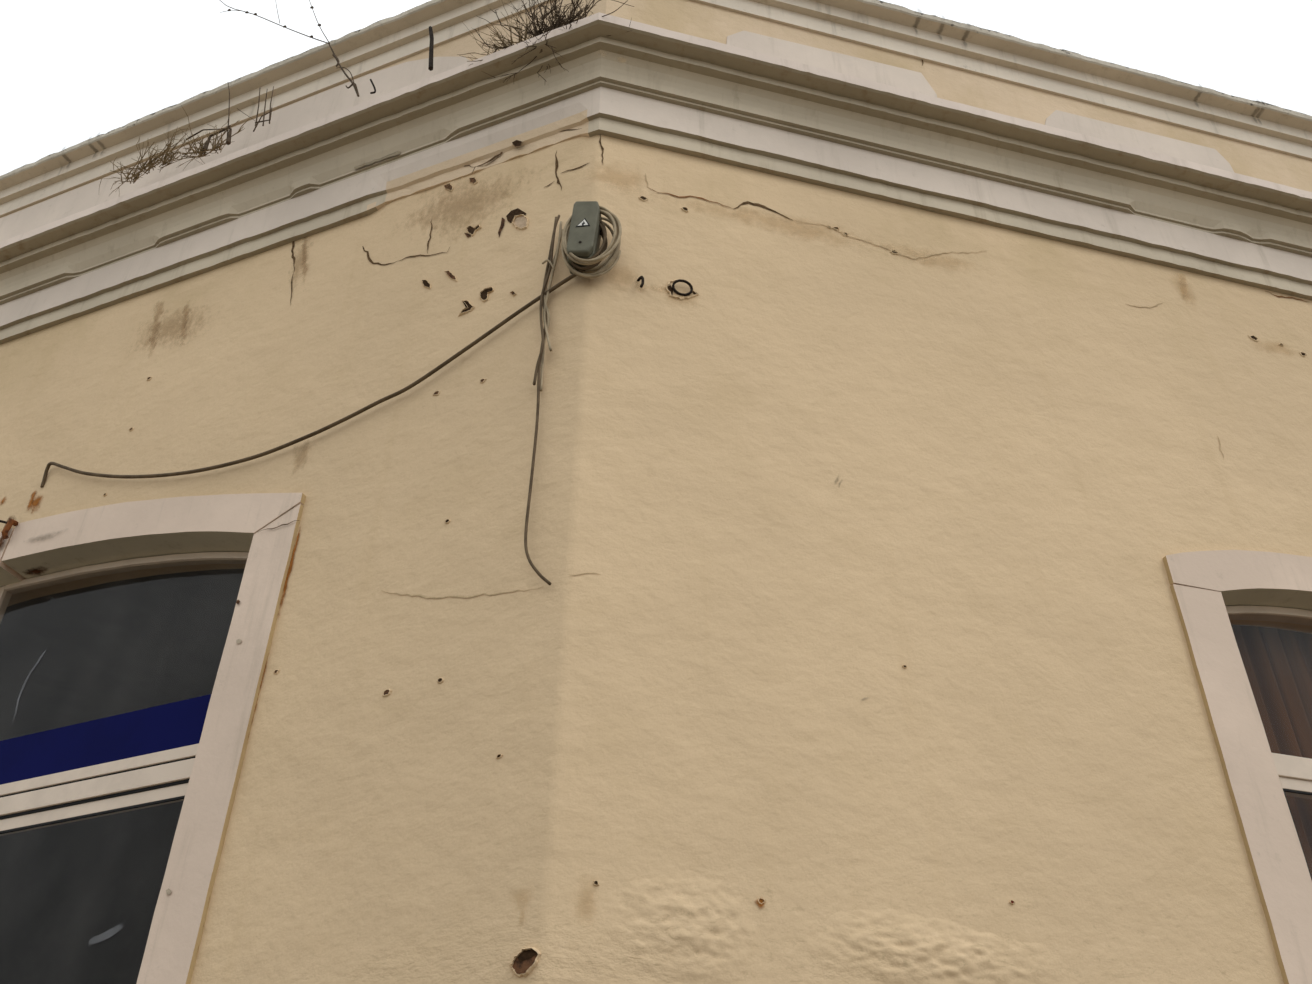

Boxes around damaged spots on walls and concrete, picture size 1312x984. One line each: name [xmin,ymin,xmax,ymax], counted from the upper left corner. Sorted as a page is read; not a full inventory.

crack [363,220,449,265]
spalling [465,224,481,237]
spalling [498,208,529,237]
crack [645,173,981,259]
spalling [458,287,494,317]
rust [27,491,41,508]
crack [381,573,598,599]
spalling [509,947,541,978]